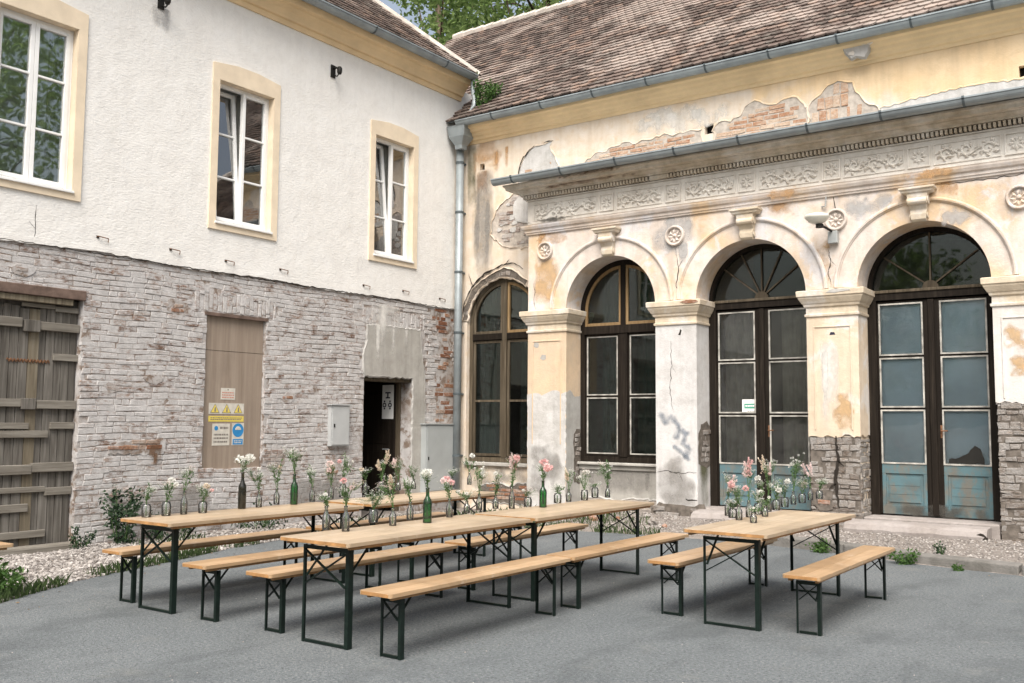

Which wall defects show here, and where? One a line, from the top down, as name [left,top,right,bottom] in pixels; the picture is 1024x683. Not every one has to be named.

spalling [584,76,1024,163]
spalling [490,140,560,250]